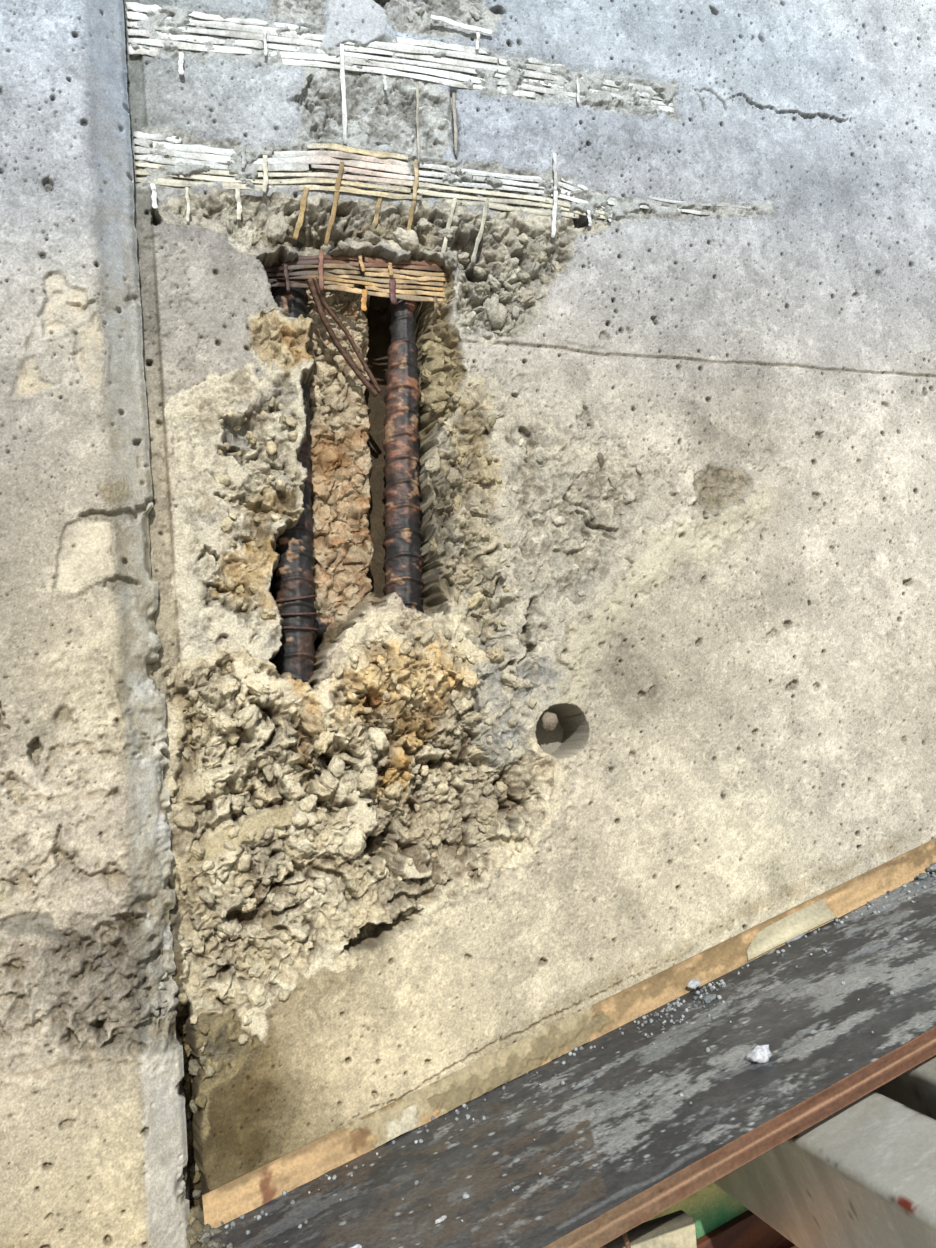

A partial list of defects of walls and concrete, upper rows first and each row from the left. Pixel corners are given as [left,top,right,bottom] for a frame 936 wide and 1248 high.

crack [687,82,856,127]
crack [463,337,936,382]
spalling [0,0,781,1174]
spalling [182,1162,202,1199]